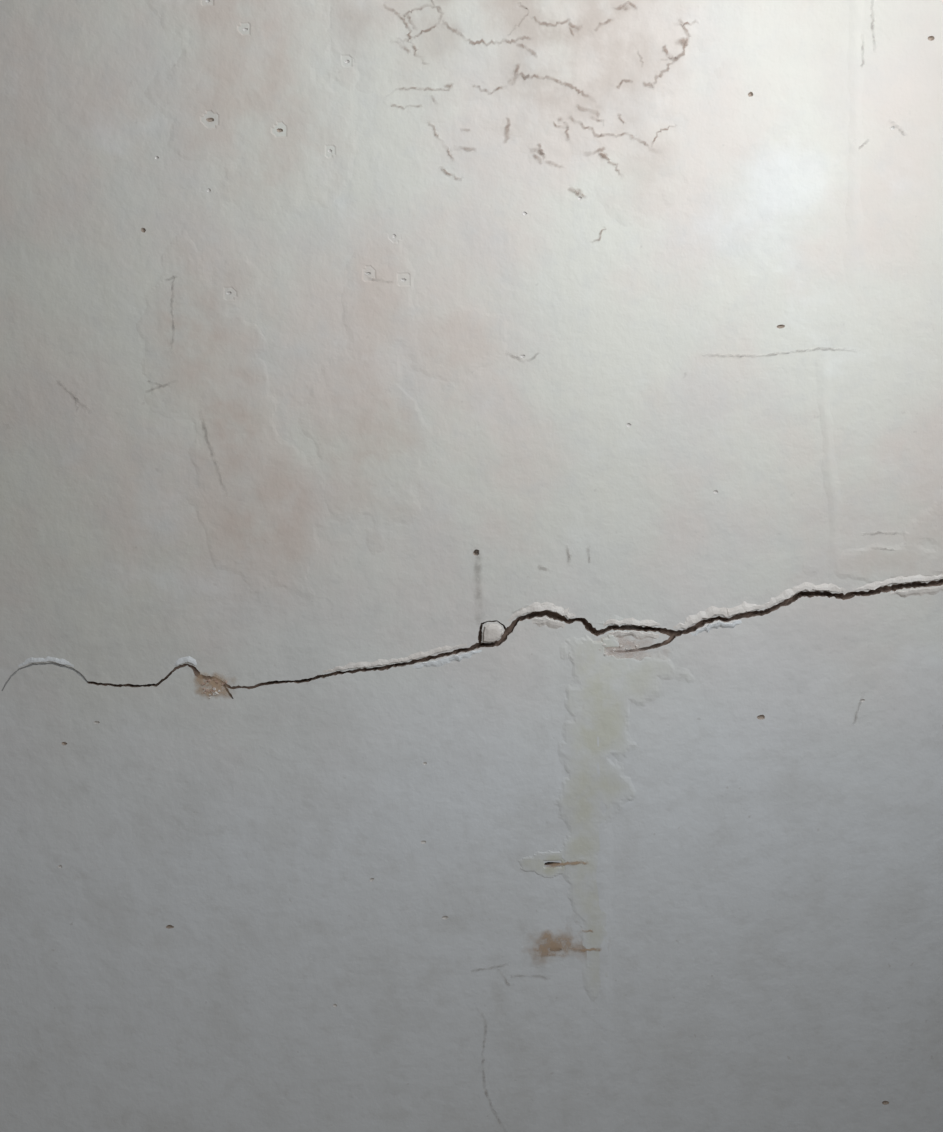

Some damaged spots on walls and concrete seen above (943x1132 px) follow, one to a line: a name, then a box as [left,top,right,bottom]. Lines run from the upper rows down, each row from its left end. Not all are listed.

crack [2,574,943,699]
corrosion [539,933,596,955]